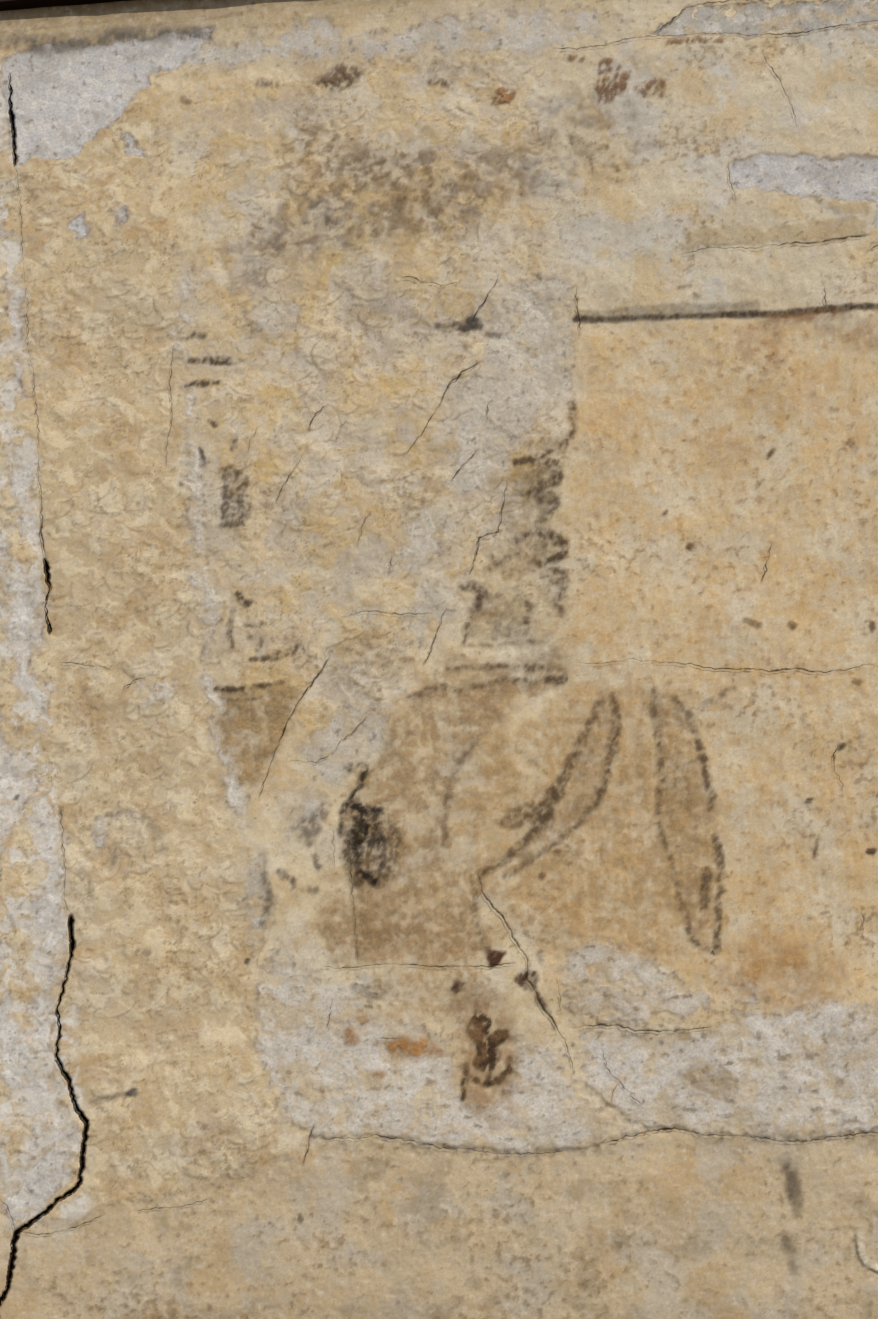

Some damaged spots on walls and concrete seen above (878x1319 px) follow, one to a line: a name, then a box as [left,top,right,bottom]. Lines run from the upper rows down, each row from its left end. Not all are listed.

crack [9,74,23,253]
peeling [0,8,598,165]
peeling [654,0,878,42]
peeling [729,153,878,228]
peeling [6,281,29,385]
peeling [444,279,576,492]
crack [33,373,52,632]
peeling [189,567,247,828]
peeling [285,691,386,841]
crack [0,811,101,1305]
flaking render [254,941,878,1155]
crack [327,836,876,1142]